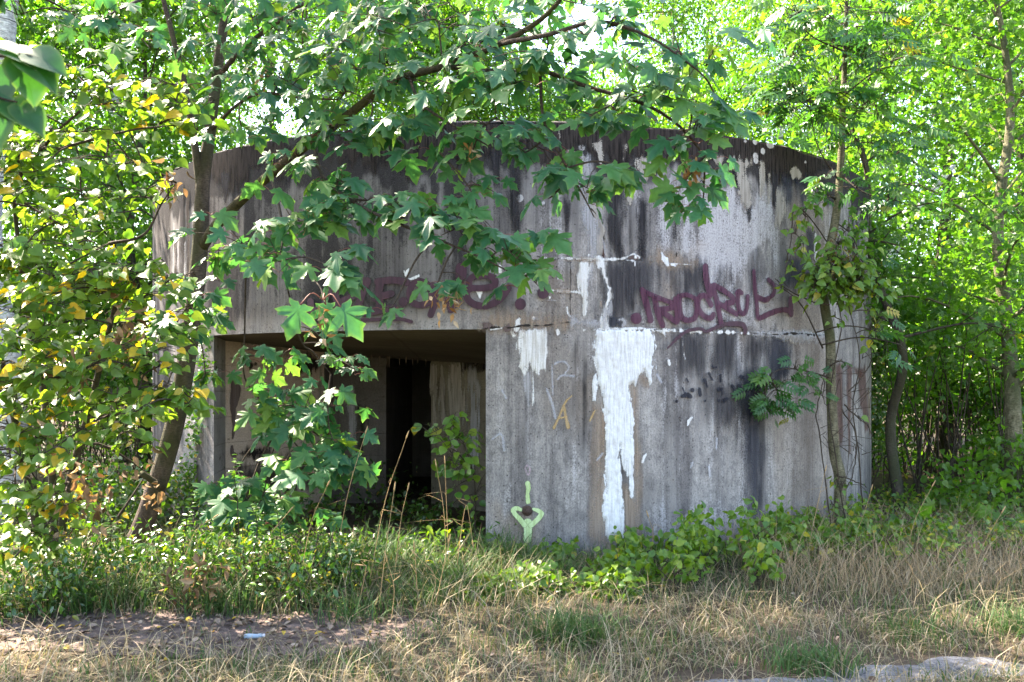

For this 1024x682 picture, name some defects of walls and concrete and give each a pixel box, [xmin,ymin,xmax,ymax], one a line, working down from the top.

water stain [785,221,817,286]
water stain [564,190,722,539]
water stain [668,326,792,513]